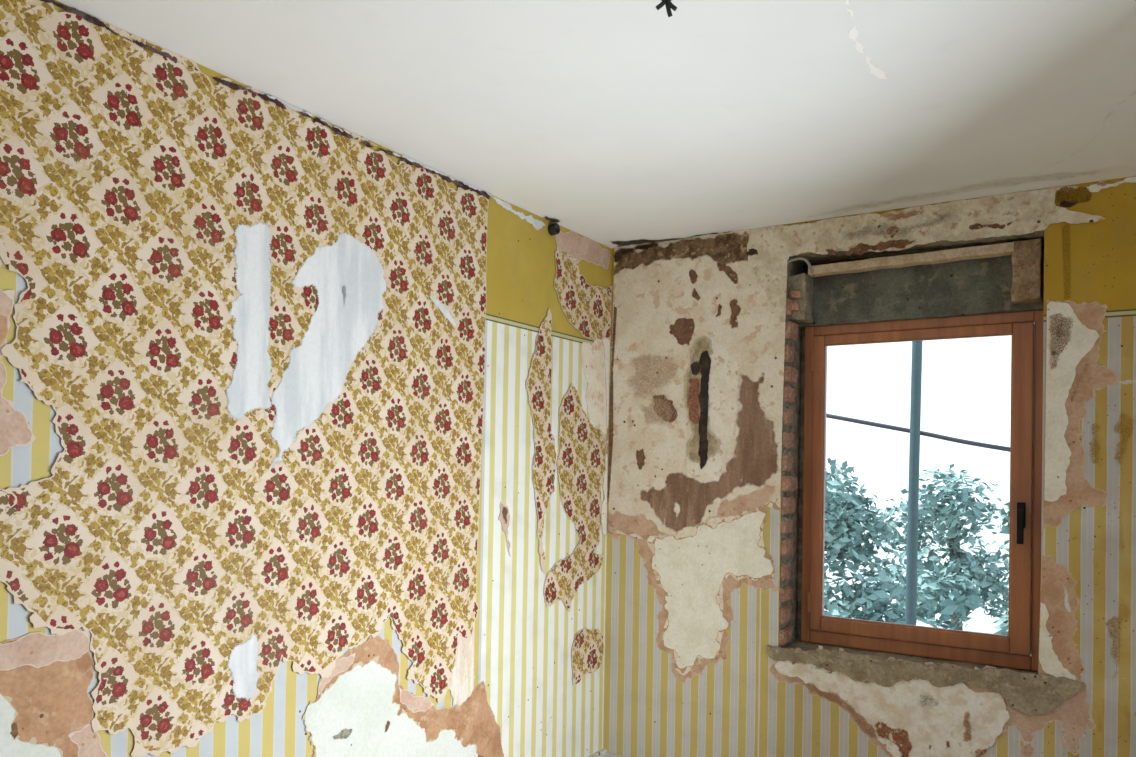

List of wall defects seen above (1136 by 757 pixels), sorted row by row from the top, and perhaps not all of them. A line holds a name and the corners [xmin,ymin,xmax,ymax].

peeling [0,289,36,456]
peeling [555,187,1105,684]
peeling [1041,300,1120,537]
peeling [0,629,108,757]
peeling [302,635,504,757]
flaking render [769,554,1096,757]